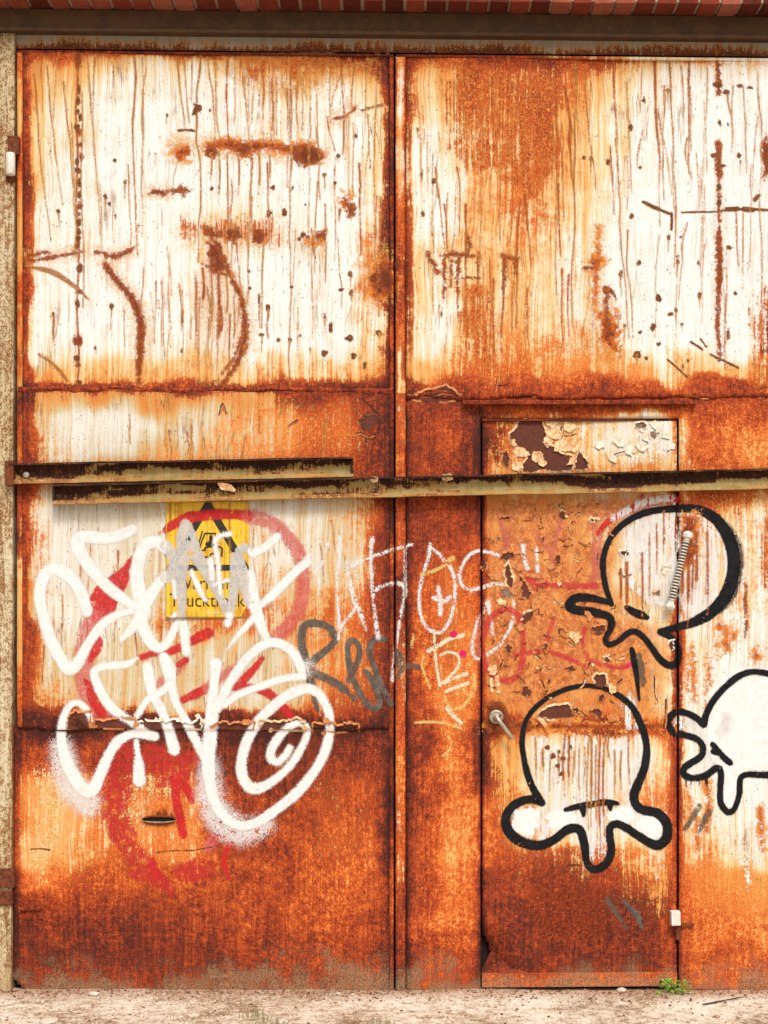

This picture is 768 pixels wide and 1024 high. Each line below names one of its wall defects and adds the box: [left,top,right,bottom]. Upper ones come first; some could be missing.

rust [31,52,768,460]
peeling [489,418,676,473]
peeling [480,549,563,631]
peeling [503,642,514,657]
peeling [569,610,607,644]
peeling [520,684,534,697]
rust [683,779,717,855]
rust [753,802,768,856]
rust [526,873,611,946]